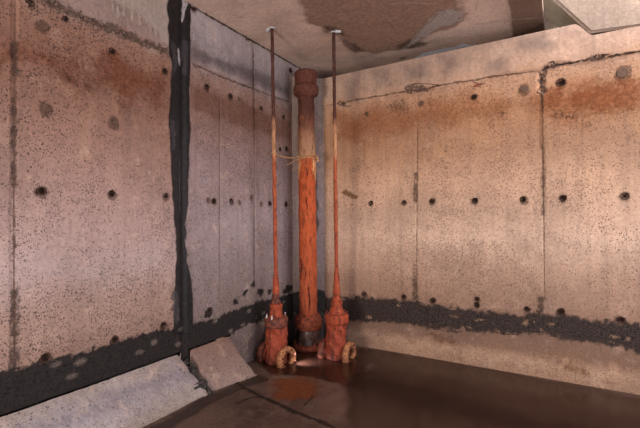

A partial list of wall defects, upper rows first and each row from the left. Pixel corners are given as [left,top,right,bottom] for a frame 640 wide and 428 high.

damp [301,0,475,59]
crack [327,51,640,312]